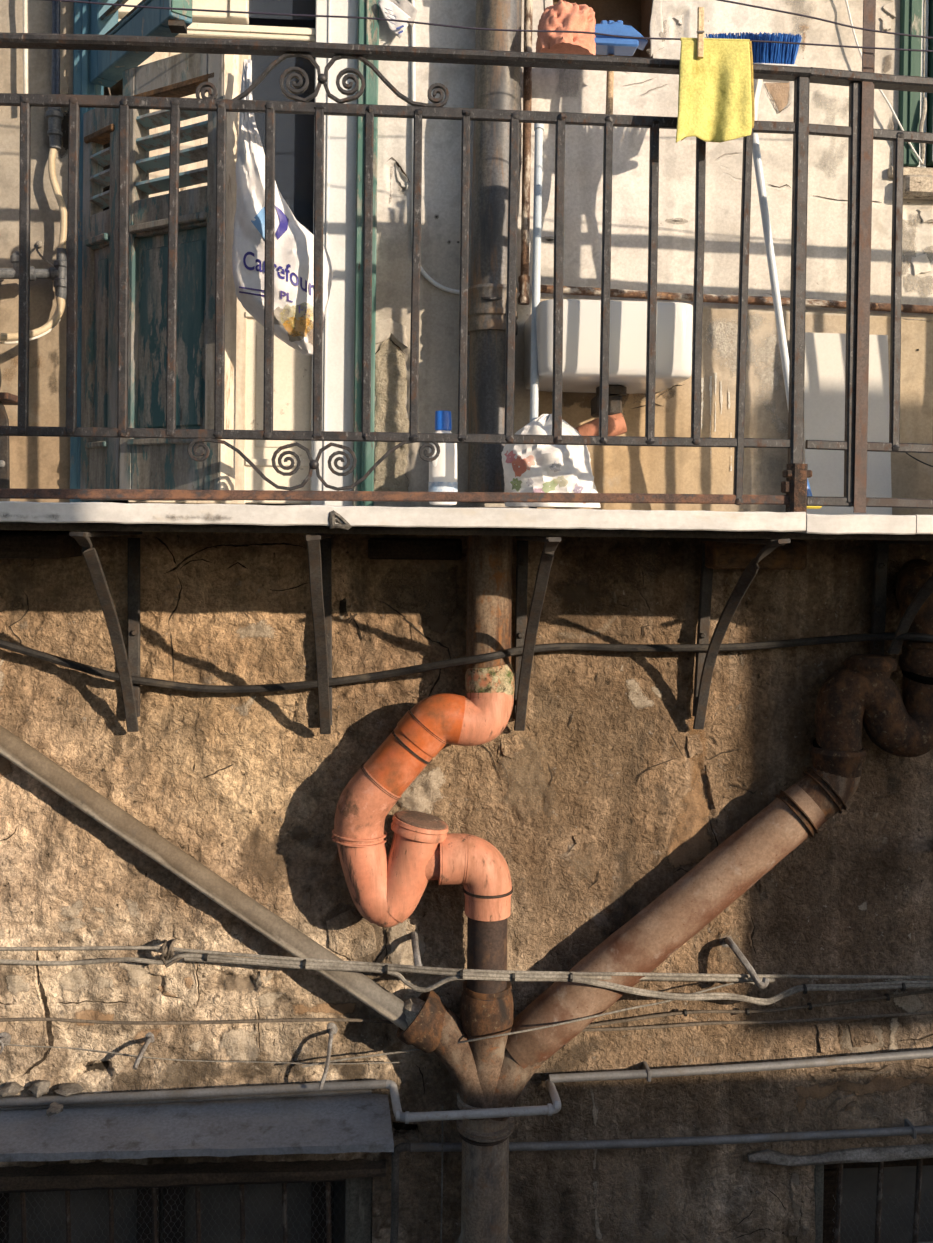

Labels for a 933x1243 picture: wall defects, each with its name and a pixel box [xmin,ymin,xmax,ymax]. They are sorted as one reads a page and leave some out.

flaking render [902,202,933,296]
crack [151,535,310,680]
crack [0,950,134,1074]
crack [192,953,200,1005]
crack [253,1007,261,1055]